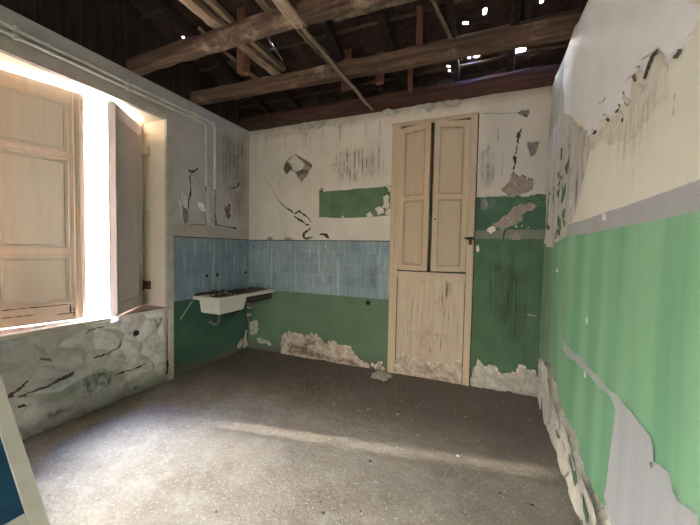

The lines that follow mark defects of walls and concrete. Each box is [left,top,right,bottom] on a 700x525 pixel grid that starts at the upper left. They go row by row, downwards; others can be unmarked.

peeling [563,0,699,150]
spalling [284,154,312,183]
crack [482,110,529,171]
crack [265,179,329,240]
peeling [366,185,391,218]
peeling [487,172,546,240]
crack [154,317,169,374]
peeling [237,320,271,348]
crack [8,372,74,408]
peeling [281,331,698,525]